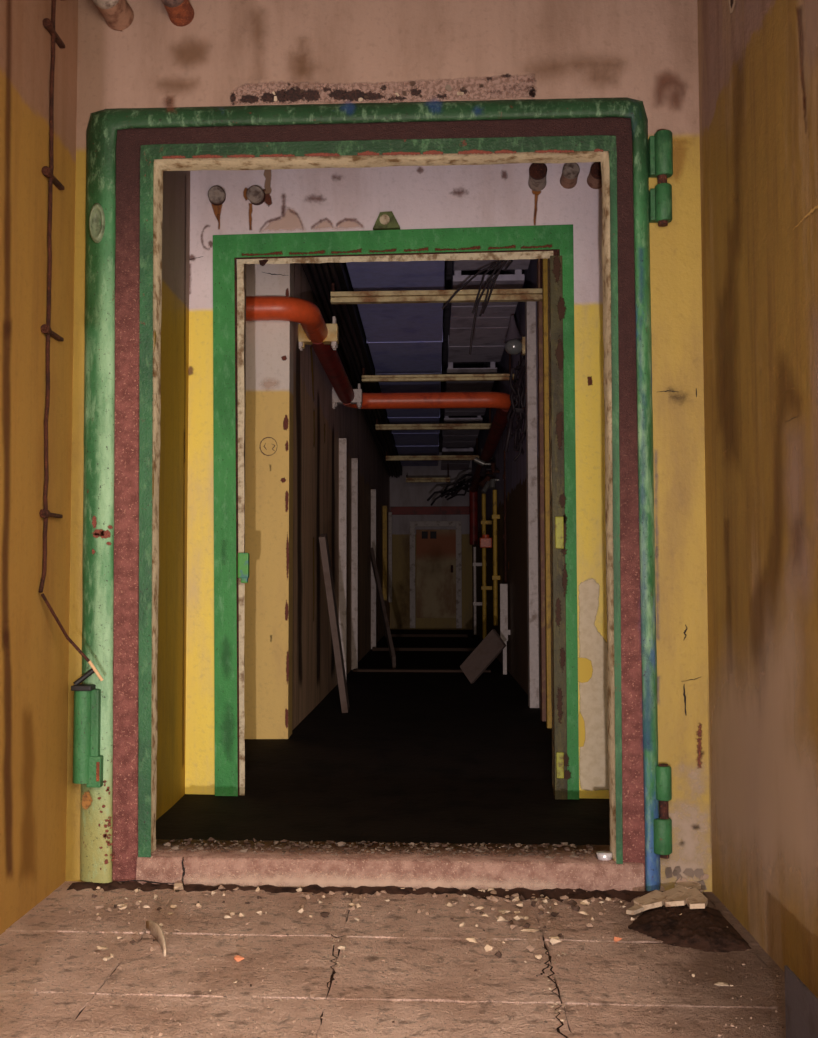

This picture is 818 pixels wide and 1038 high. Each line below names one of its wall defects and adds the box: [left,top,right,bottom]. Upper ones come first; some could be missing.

spalling [230,74,536,105]
rust [211,204,222,229]
rust [243,188,272,230]
peeling [555,412,563,450]
peeling [555,494,609,790]
crack [536,947,568,1038]